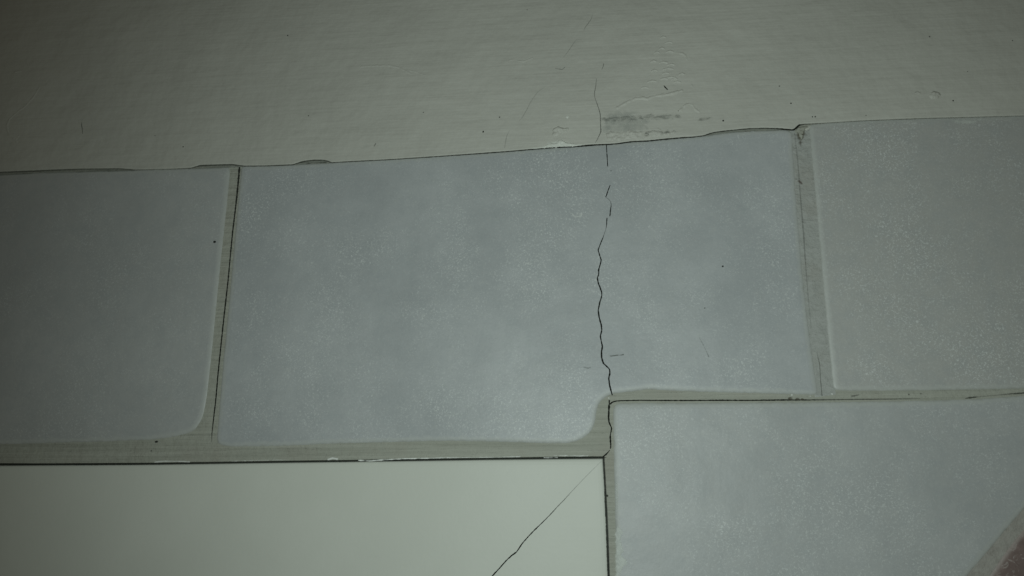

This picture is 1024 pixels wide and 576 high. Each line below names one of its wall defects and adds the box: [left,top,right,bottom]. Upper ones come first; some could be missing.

crack [0,114,826,576]